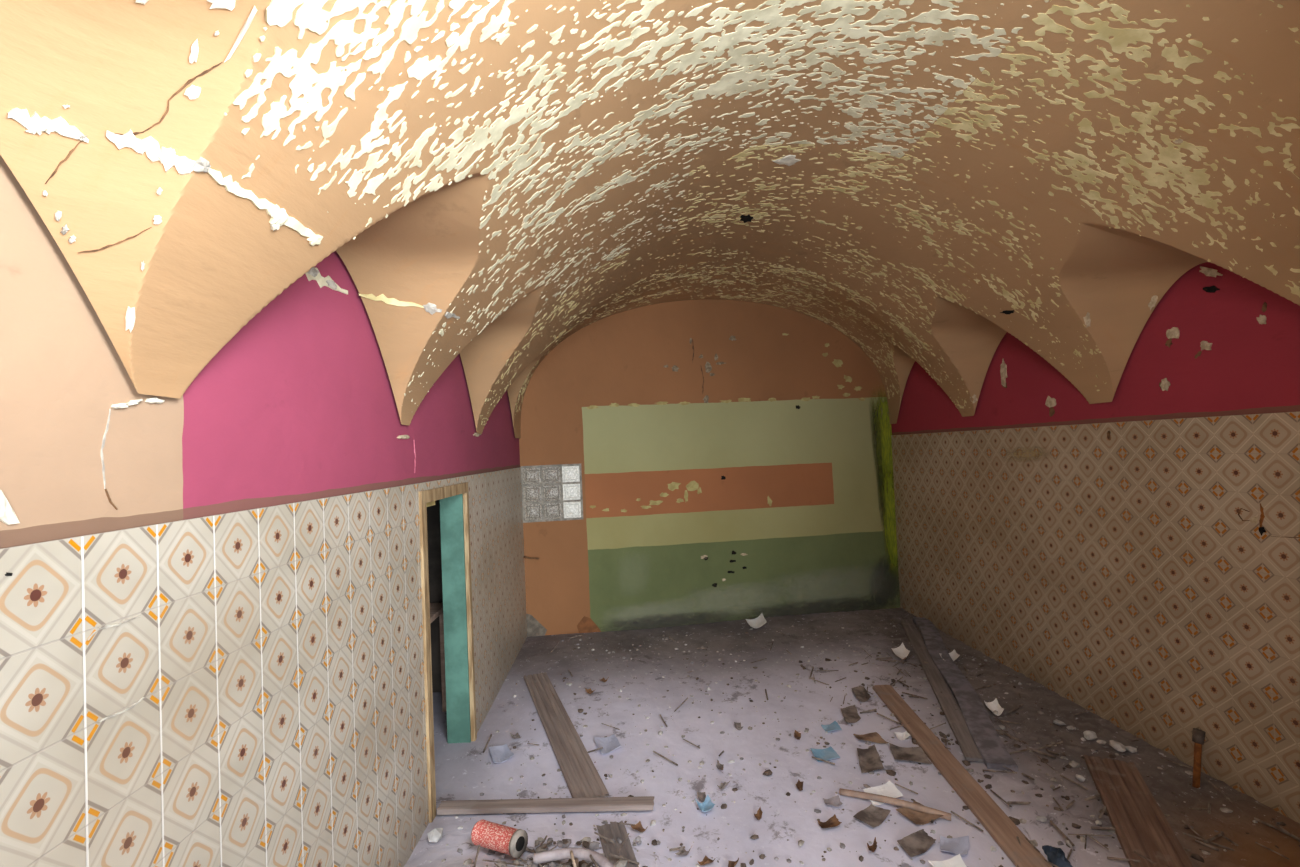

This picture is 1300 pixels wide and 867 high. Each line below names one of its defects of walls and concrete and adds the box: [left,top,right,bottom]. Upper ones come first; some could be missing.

spalling [207,0,235,11]
peeling [55,210,76,243]
crack [8,62,460,336]
peeling [224,0,1300,437]
crack [101,409,118,510]
peeling [590,481,702,512]